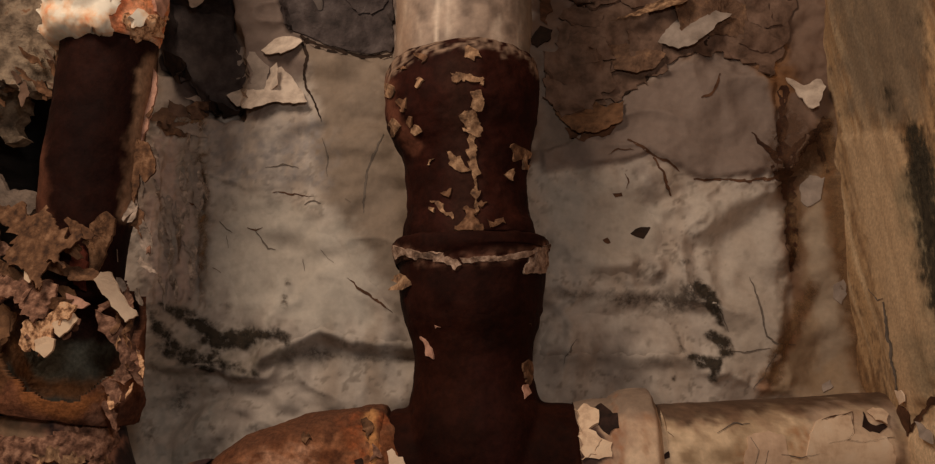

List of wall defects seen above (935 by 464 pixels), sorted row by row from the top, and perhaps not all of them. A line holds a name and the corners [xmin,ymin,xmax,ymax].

flaking render [0,0,56,148]
flaking render [531,0,797,142]
peeling [786,78,826,109]
flaking render [0,174,37,216]
spalling [127,0,394,313]
water stain [901,123,935,314]
water stain [150,302,287,376]
water stain [620,281,733,381]
crack [717,277,793,389]
crack [868,289,897,391]
crack [717,396,935,464]